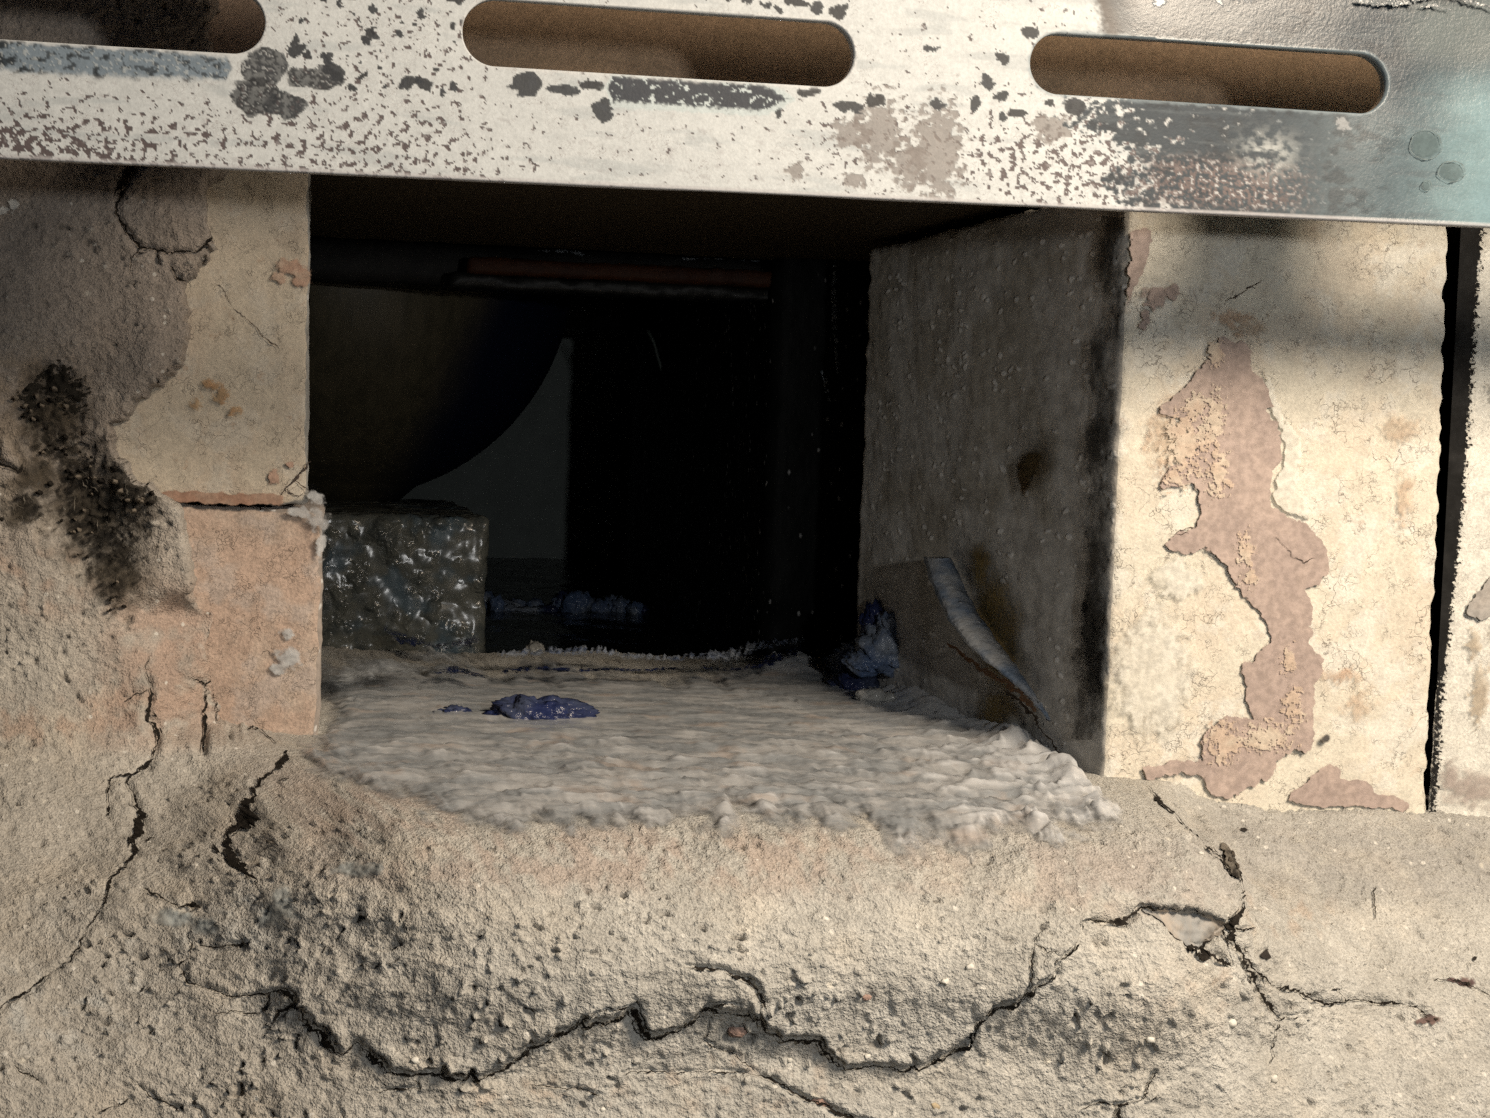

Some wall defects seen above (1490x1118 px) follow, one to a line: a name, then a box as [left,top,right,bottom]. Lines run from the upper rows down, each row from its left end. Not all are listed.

crack [115,166,278,347]
peeling [271,258,310,287]
crack [0,454,23,473]
peeling [1143,336,1330,799]
peeling [1289,764,1409,812]
crack [0,659,1159,1118]
crack [1148,785,1490,1062]